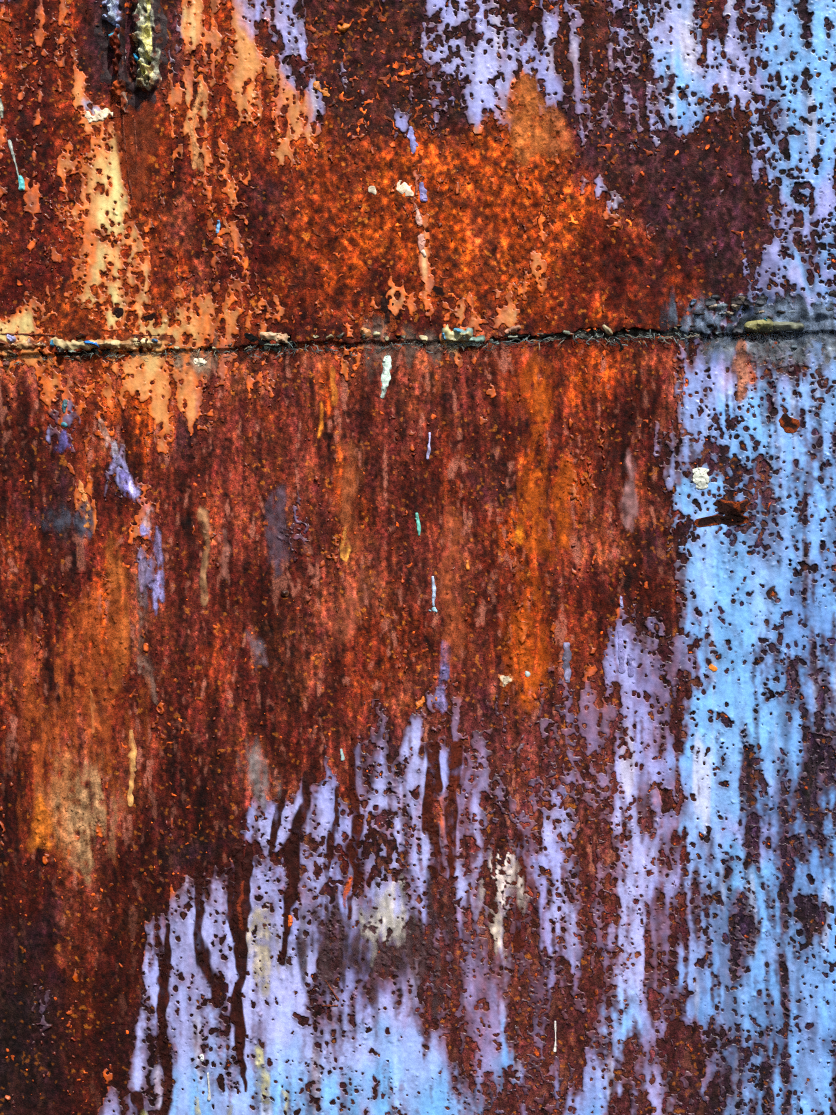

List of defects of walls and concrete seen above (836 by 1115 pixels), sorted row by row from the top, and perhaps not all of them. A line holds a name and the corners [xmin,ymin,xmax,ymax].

peeling [337,48,365,108]
rust [0,102,101,399]
rust [89,79,216,319]
peeling [0,0,340,600]
peeling [321,164,564,386]
peeling [473,368,521,426]
peeling [579,165,636,229]
peeling [35,772,107,873]
rust [188,825,253,1092]
rust [255,764,322,965]
rust [324,786,339,872]
rust [466,989,491,1051]